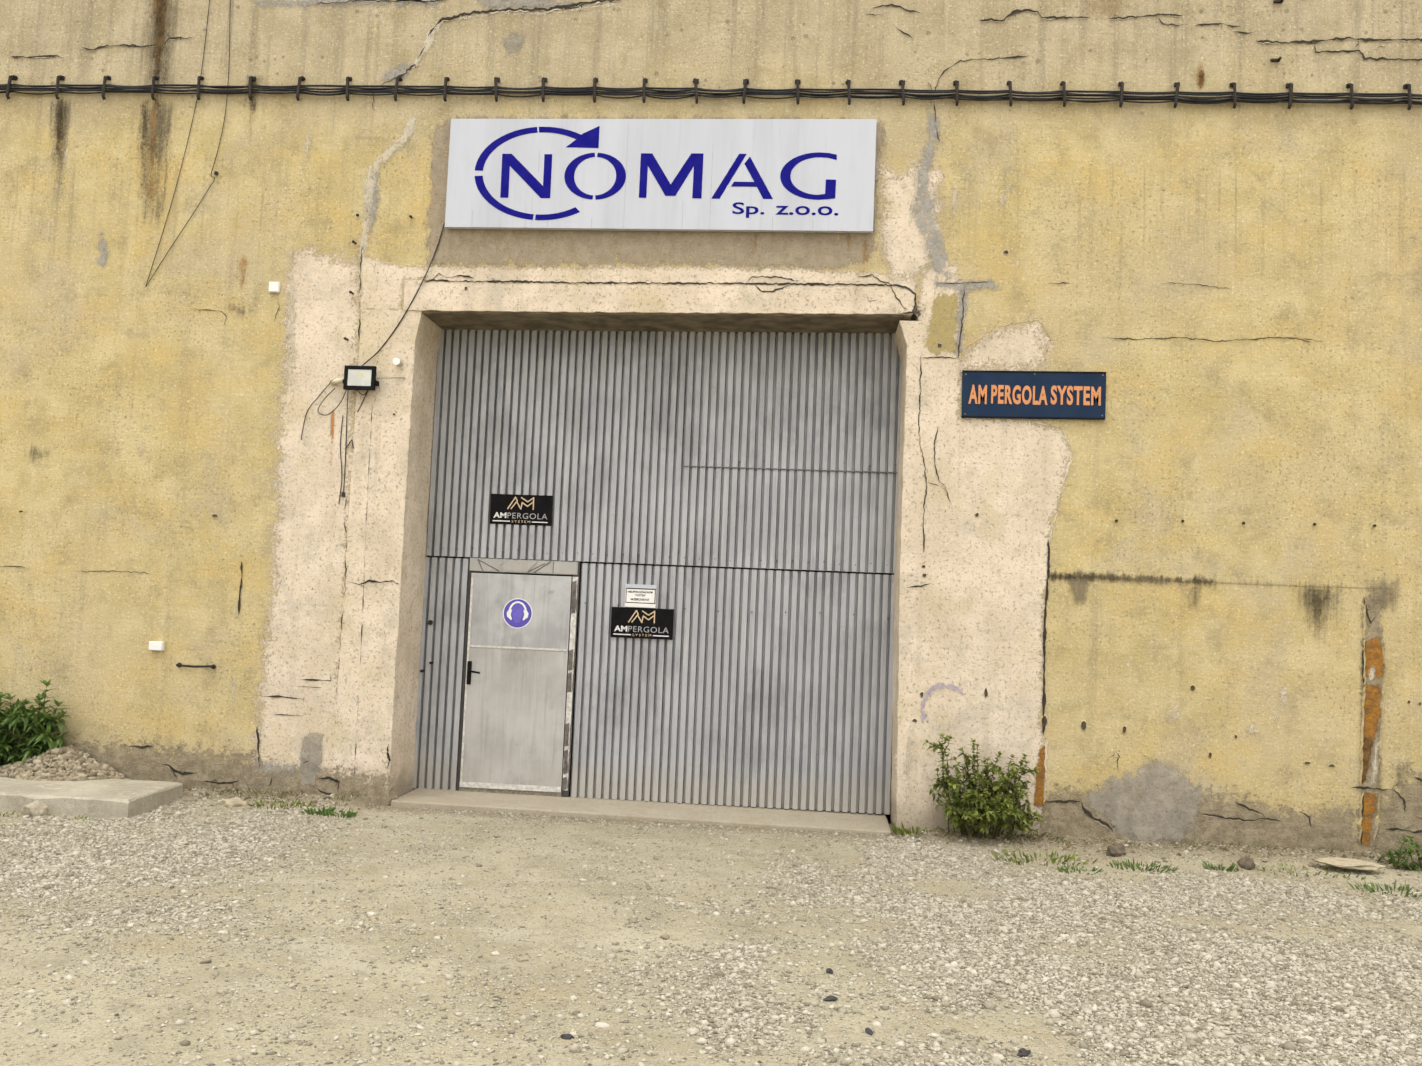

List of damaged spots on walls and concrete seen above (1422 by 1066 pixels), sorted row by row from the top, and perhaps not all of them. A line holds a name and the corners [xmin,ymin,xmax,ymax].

corrosion [154,0,167,84]
crack [315,0,619,110]
crack [870,4,920,39]
crack [979,9,1422,61]
water stain [50,99,70,181]
crack [358,117,416,338]
crack [424,56,1027,588]
crack [1108,335,1320,343]
water stain [1049,571,1216,604]
water stain [1304,588,1338,621]
corrosion [1033,736,1048,806]